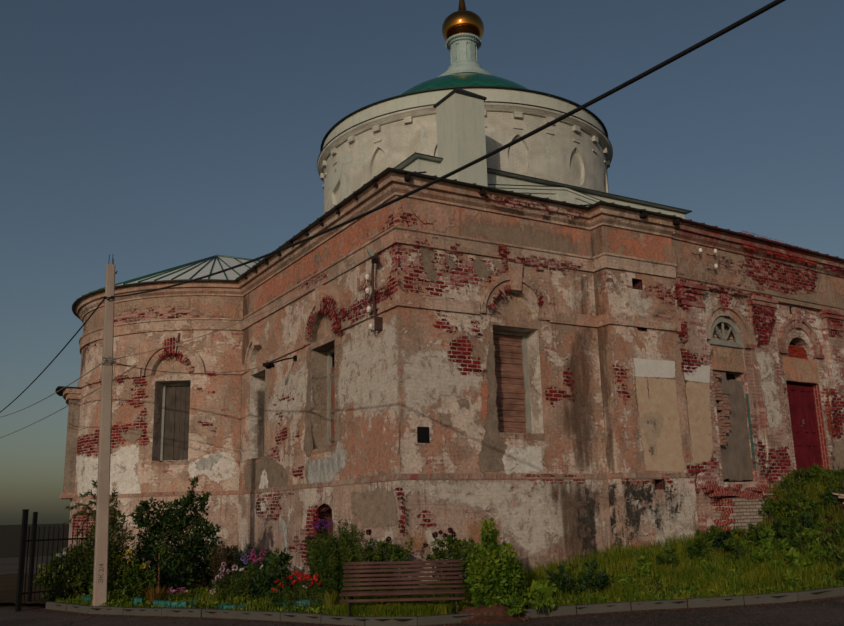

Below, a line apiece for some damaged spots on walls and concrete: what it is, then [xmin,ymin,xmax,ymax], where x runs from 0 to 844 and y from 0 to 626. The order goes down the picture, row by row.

flaking render [306,234,583,339]
peeling [72,430,99,537]
peeling [110,374,149,494]
flaking render [157,337,194,376]
peeling [188,452,238,484]
flaking render [255,469,320,566]
peeling [337,310,487,418]
peeling [395,446,585,556]
flaking render [545,359,576,407]
leakage [552,485,599,557]
leakage [608,479,683,549]
peeling [605,231,844,547]